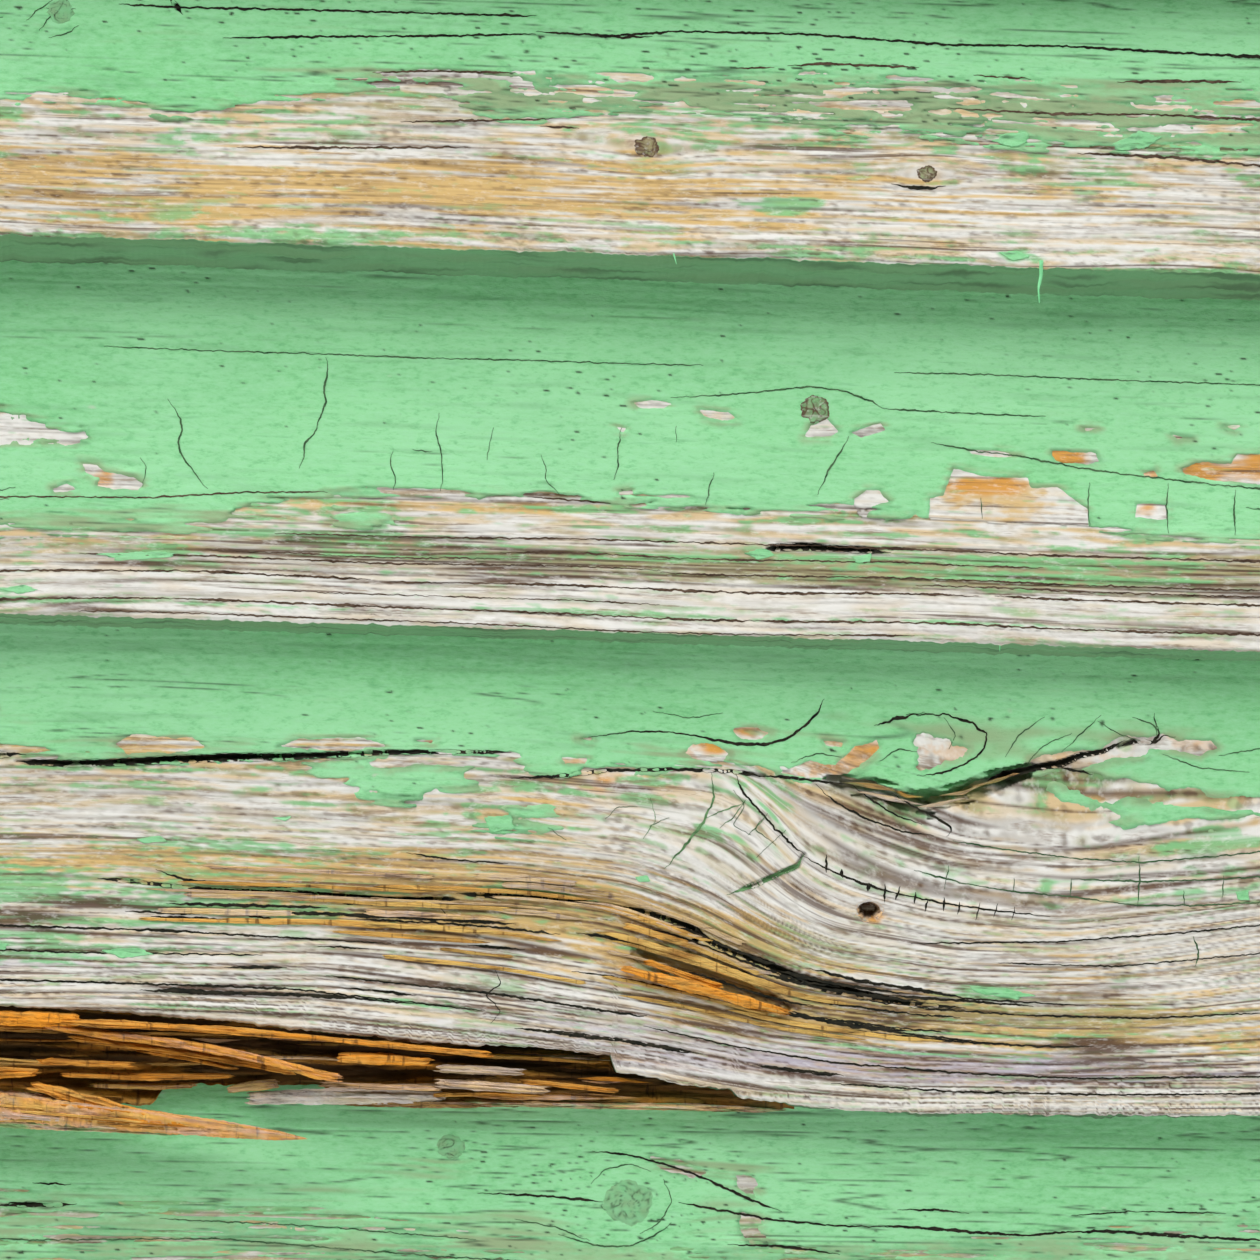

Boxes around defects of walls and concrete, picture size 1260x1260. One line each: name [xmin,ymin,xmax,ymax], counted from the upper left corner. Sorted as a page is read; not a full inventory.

crack [0,0,79,38]
peeling [0,69,1260,275]
peeling [0,412,88,446]
peeling [805,419,885,438]
peeling [83,464,143,490]
peeling [1052,451,1099,465]
peeling [1183,454,1260,485]
peeling [0,469,1260,652]
peeling [733,727,768,740]
crack [0,699,1260,968]
peeling [0,733,1260,1117]
crack [0,853,1260,1096]